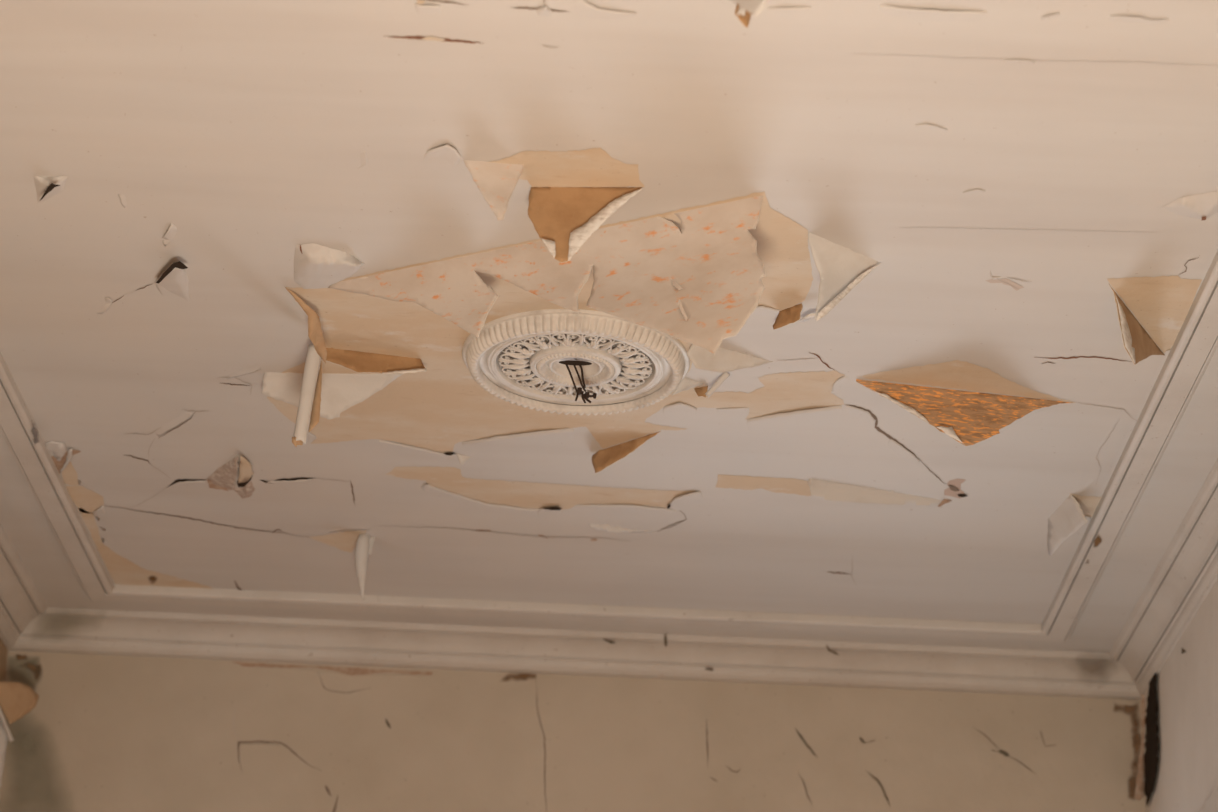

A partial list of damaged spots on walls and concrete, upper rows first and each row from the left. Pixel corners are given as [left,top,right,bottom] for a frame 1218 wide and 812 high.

peeling [731,0,811,28]
peeling [137,261,190,303]
peeling [261,144,1075,529]
peeling [1107,258,1202,365]
peeling [45,441,213,589]
crack [106,440,310,538]
crack [261,477,355,504]
peeling [1047,493,1101,556]
peeling [0,638,39,788]
crack [535,676,547,812]